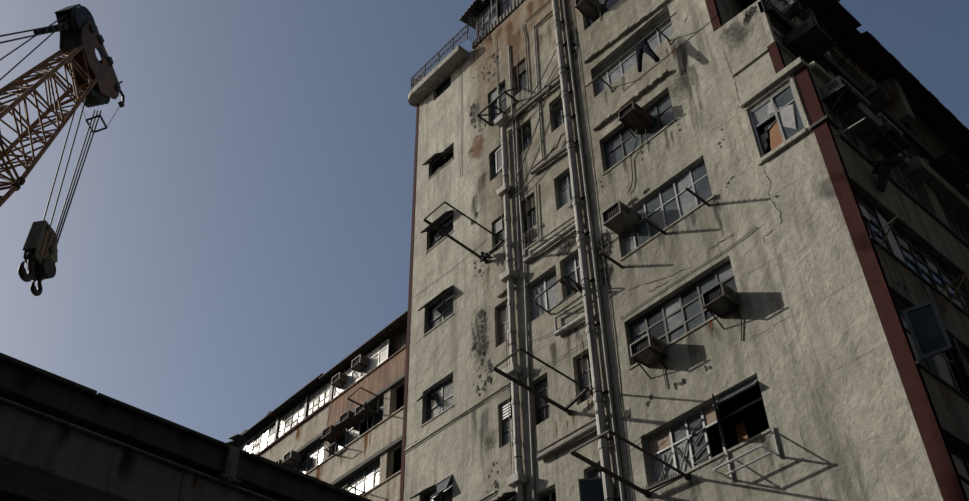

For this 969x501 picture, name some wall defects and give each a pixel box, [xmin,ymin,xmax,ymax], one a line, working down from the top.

damp [726,6,757,41]
crack [629,267,690,292]
spalling [471,309,493,397]